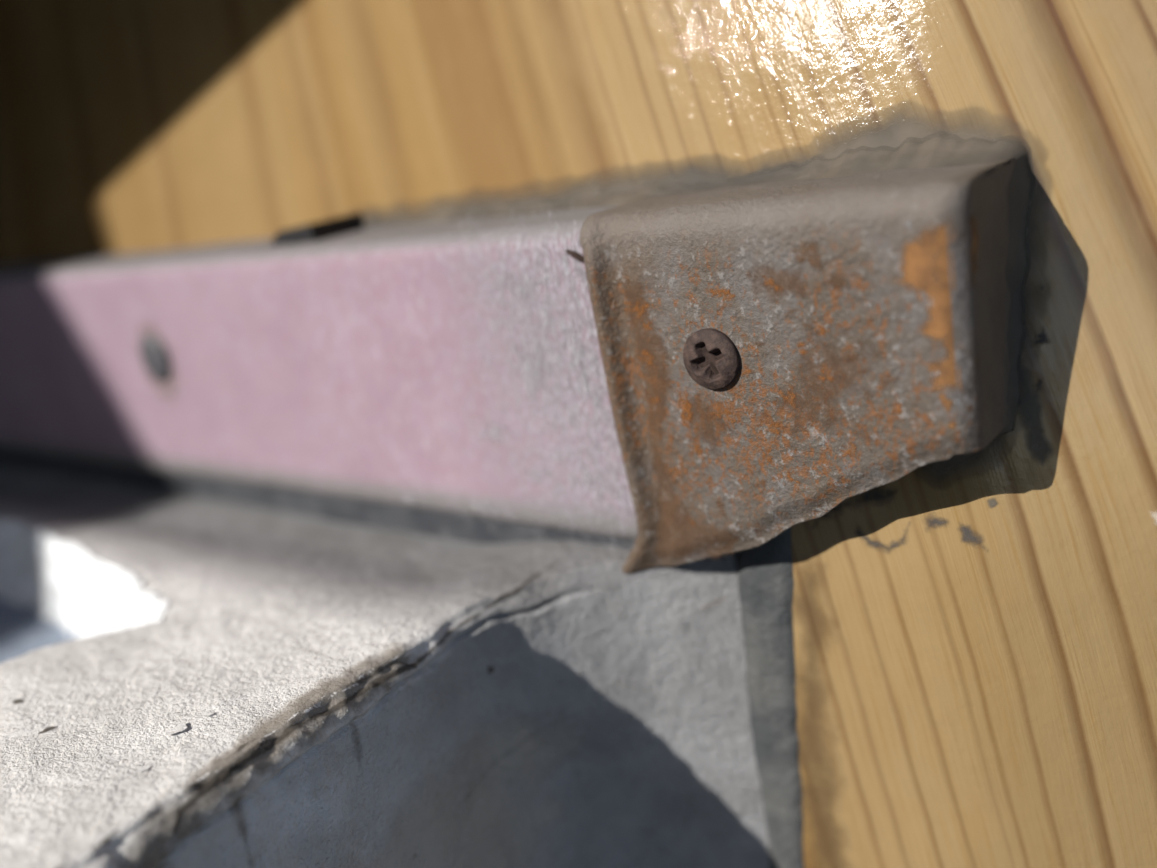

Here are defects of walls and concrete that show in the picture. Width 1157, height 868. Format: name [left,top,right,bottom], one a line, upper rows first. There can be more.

corrosion [903,223,962,428]
spalling [0,517,168,664]